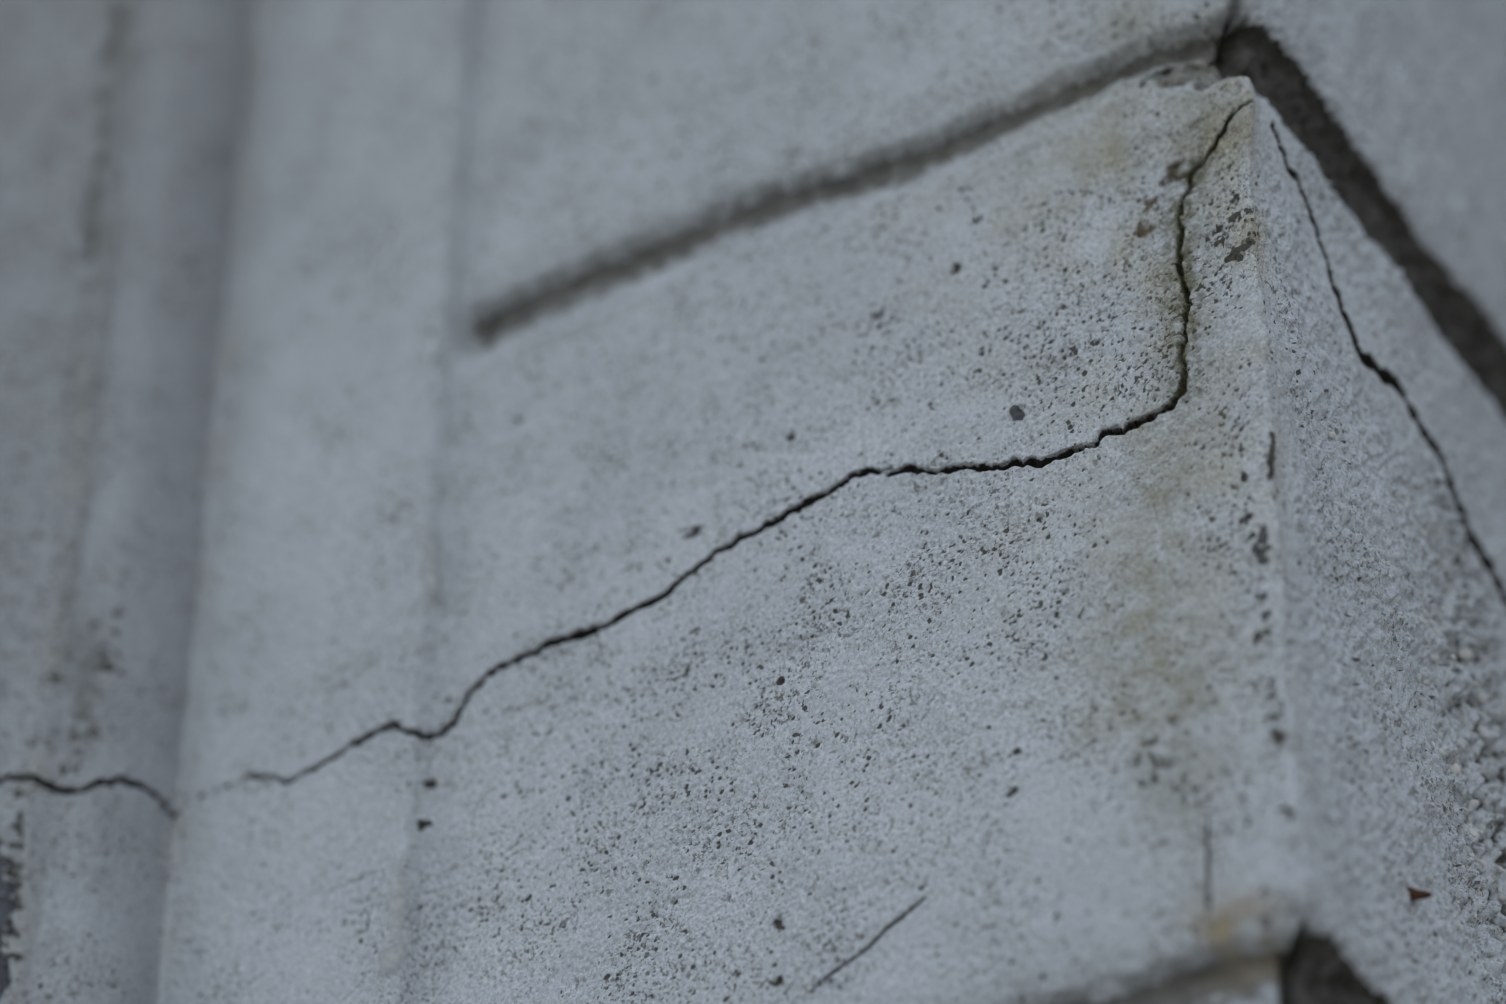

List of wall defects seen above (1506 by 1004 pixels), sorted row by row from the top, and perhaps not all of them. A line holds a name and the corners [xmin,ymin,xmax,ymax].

crack [0,114,1506,818]
peeling [0,840,35,997]
crack [1204,813,1212,914]